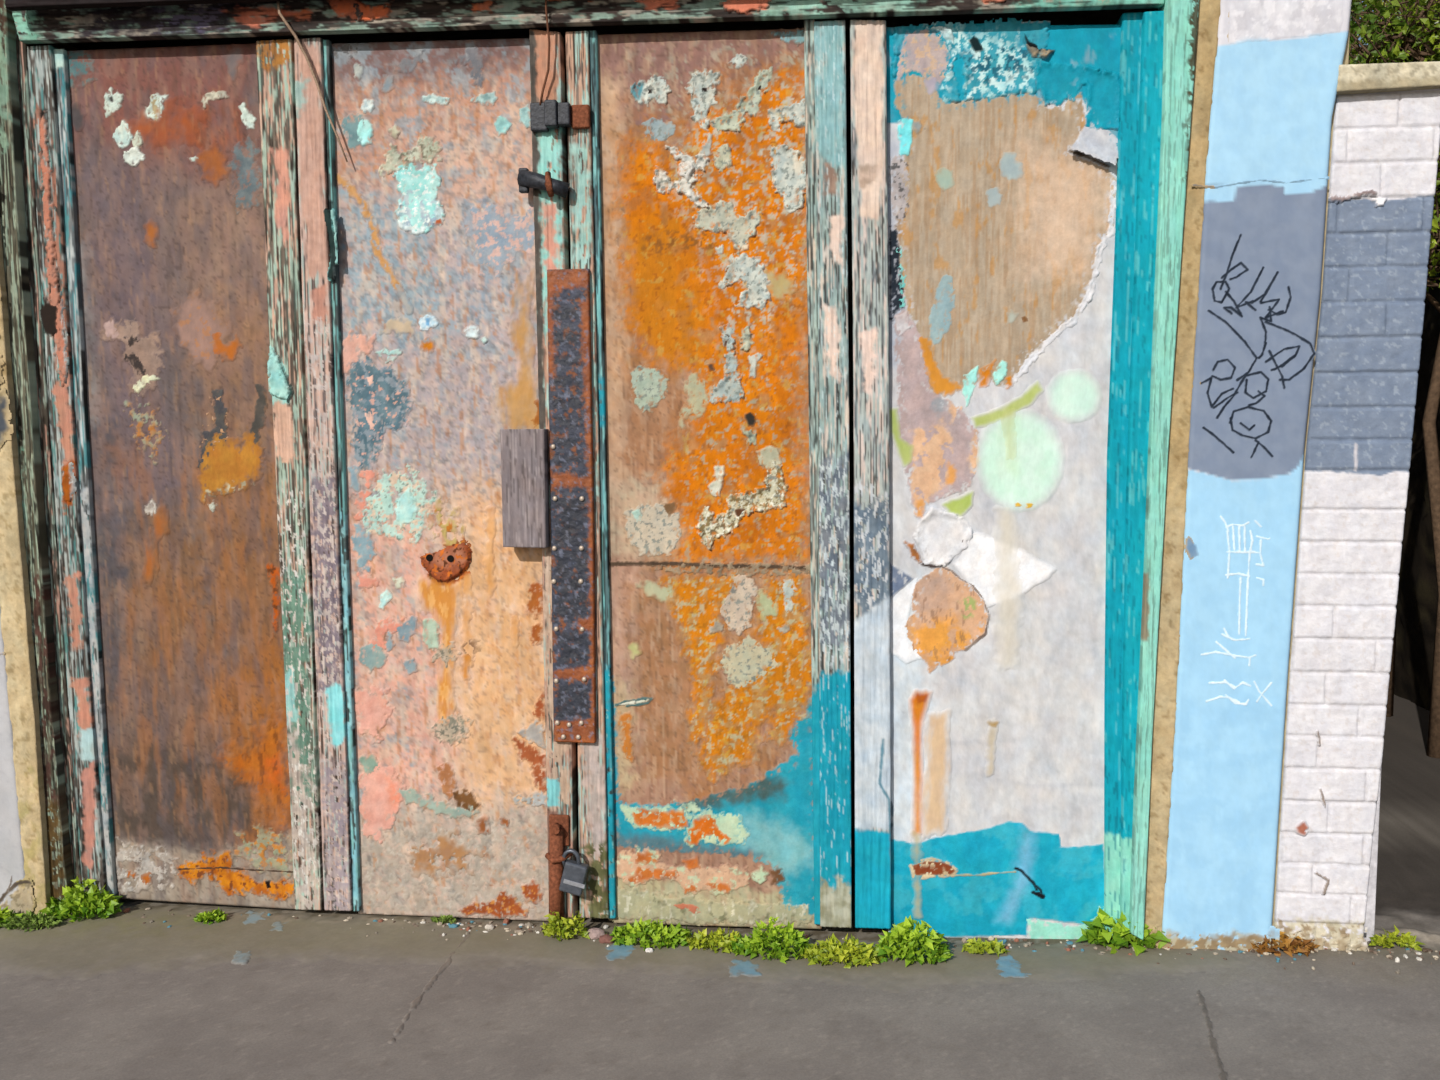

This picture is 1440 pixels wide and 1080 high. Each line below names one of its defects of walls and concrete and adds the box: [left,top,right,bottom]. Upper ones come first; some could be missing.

peeling [103,86,169,167]
peeling [200,90,257,130]
peeling [338,98,446,236]
crack [1191,176,1330,189]
peeling [622,53,806,558]
peeling [887,0,1120,675]
rust [416,494,498,723]
rust [211,701,291,834]
peeling [357,689,549,920]
peeling [606,801,814,928]
rust [908,688,953,920]
crack [1196,990,1228,1080]